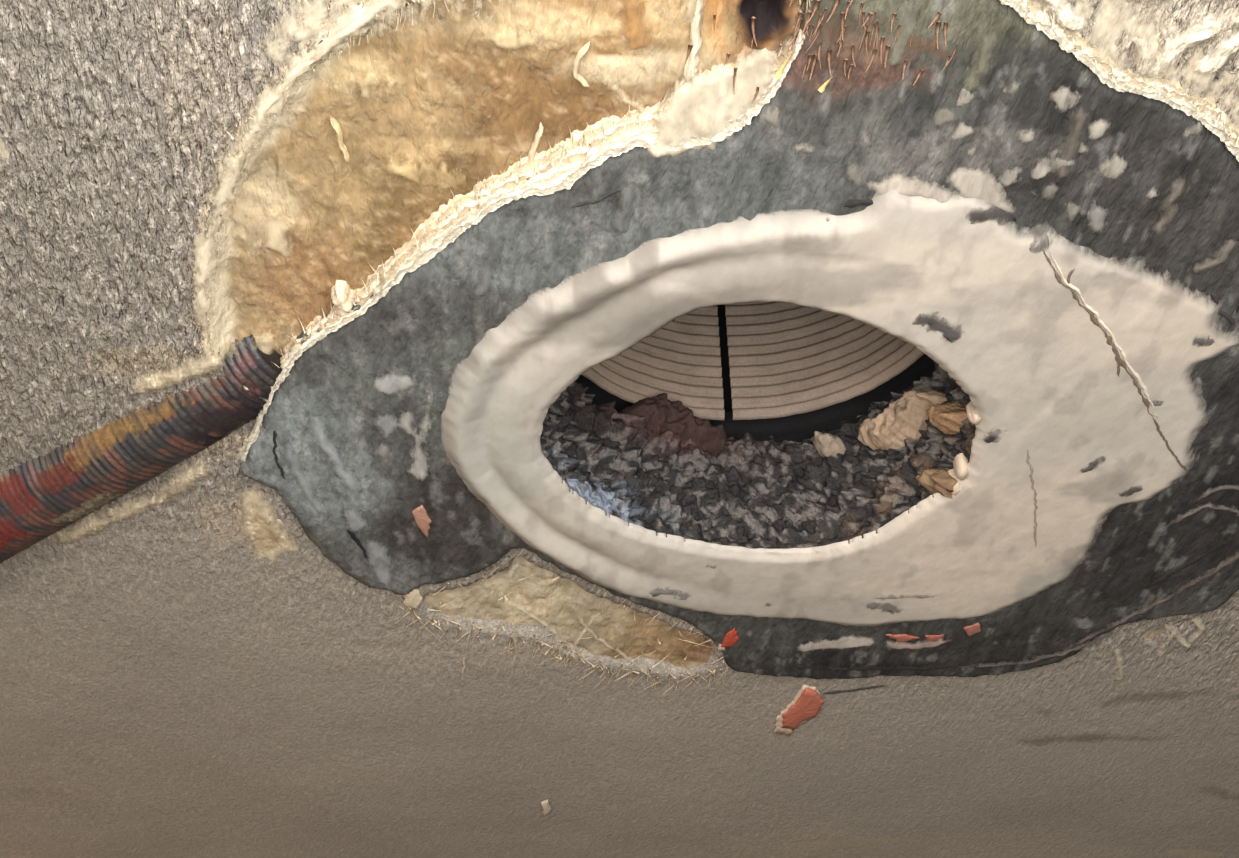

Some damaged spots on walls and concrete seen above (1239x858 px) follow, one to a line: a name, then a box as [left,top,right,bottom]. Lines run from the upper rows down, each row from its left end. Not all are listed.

corrosion [708,0,958,93]
spalling [1000,0,1239,162]
spalling [187,0,811,479]
spalling [843,199,873,208]
spalling [1210,293,1239,325]
spalling [238,489,298,561]
spalling [347,530,373,568]
spalling [389,549,739,694]
spalling [1141,617,1205,656]